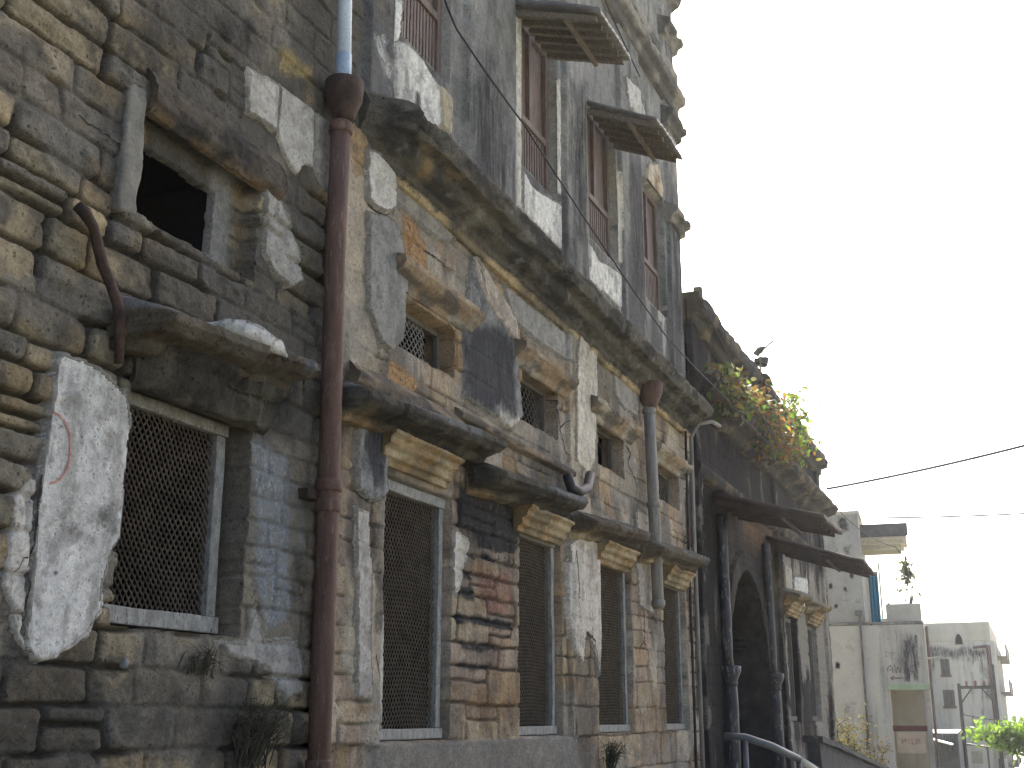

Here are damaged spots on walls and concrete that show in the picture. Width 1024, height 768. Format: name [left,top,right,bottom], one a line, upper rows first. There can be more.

leakage [465,326,516,418]
peeling [562,538,602,678]
leakage [900,636,918,682]